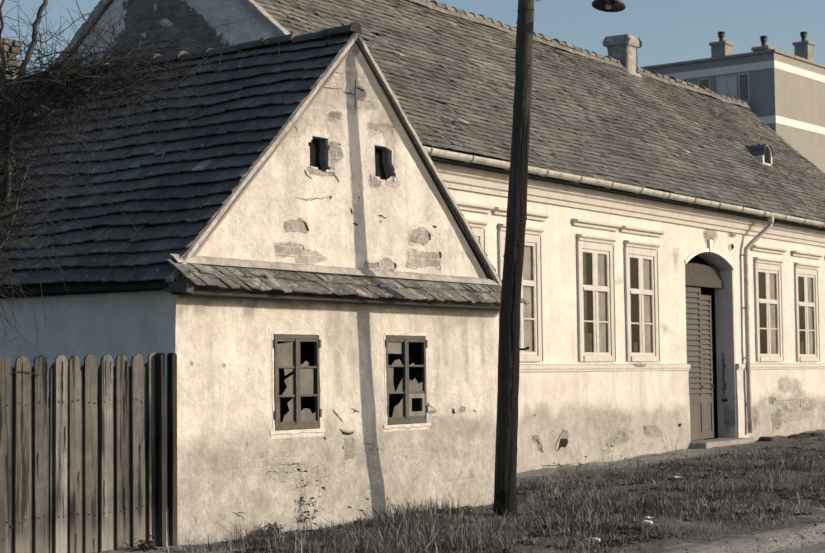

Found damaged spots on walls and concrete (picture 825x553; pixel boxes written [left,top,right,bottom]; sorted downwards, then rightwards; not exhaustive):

flaking render [103,0,229,63]
crack [324,72,365,115]
peeling [283,53,400,203]
flaking render [274,217,441,271]
flaking render [769,379,817,430]
flaking render [341,429,356,460]
spalling [532,434,544,453]
spalling [555,430,569,451]